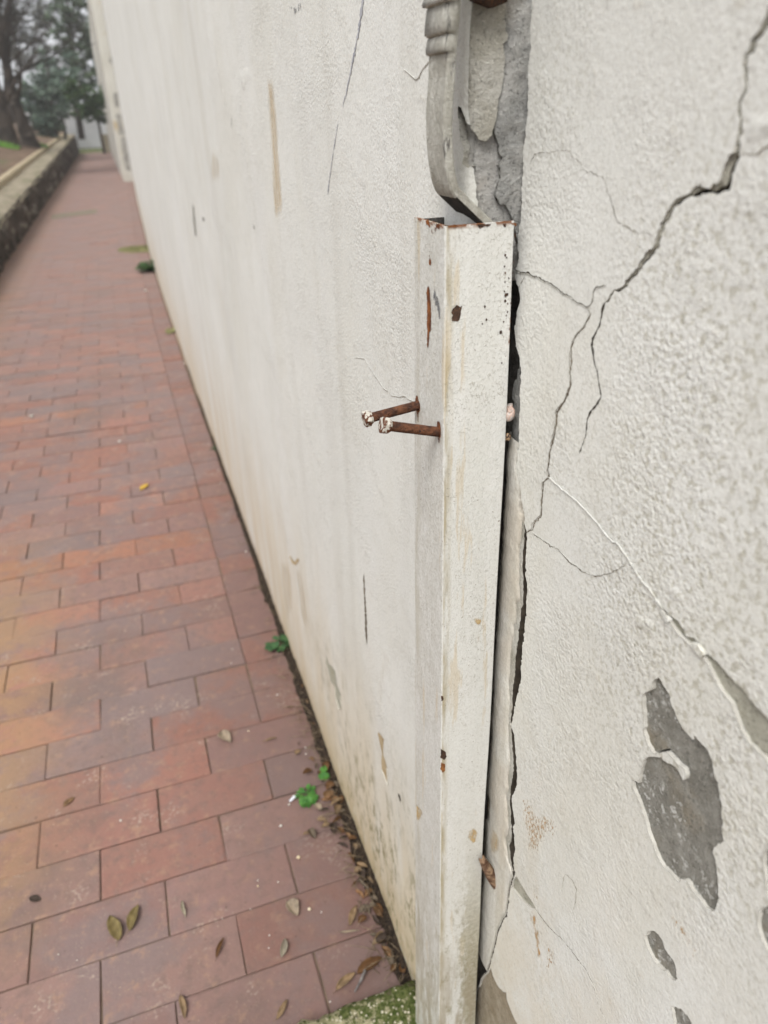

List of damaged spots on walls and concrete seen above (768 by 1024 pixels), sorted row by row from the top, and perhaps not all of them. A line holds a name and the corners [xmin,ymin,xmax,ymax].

crack [327,0,364,196]
spalling [464,0,532,281]
corrosion [451,305,462,321]
crack [487,17,768,970]
peeling [661,608,768,764]
peeling [632,679,724,910]
peeling [643,930,678,979]